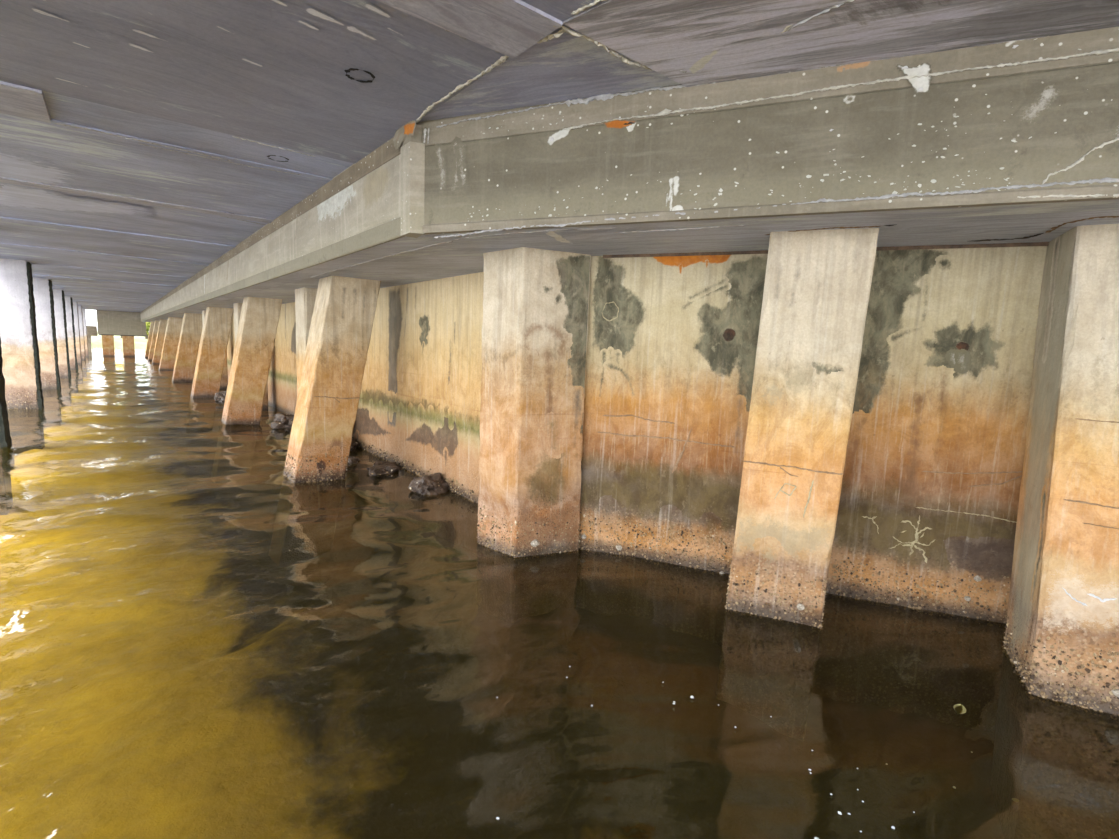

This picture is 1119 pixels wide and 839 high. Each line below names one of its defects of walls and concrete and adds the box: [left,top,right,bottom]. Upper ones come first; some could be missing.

leakage [537,0,651,70]
crack [781,0,855,33]
leakage [416,51,509,123]
leakage [437,48,721,128]
leakage [563,48,1119,130]
crack [1043,114,1119,184]
corrosion [652,255,732,274]
leakage [590,256,650,399]
leakage [679,254,768,458]
leakage [840,249,1012,496]